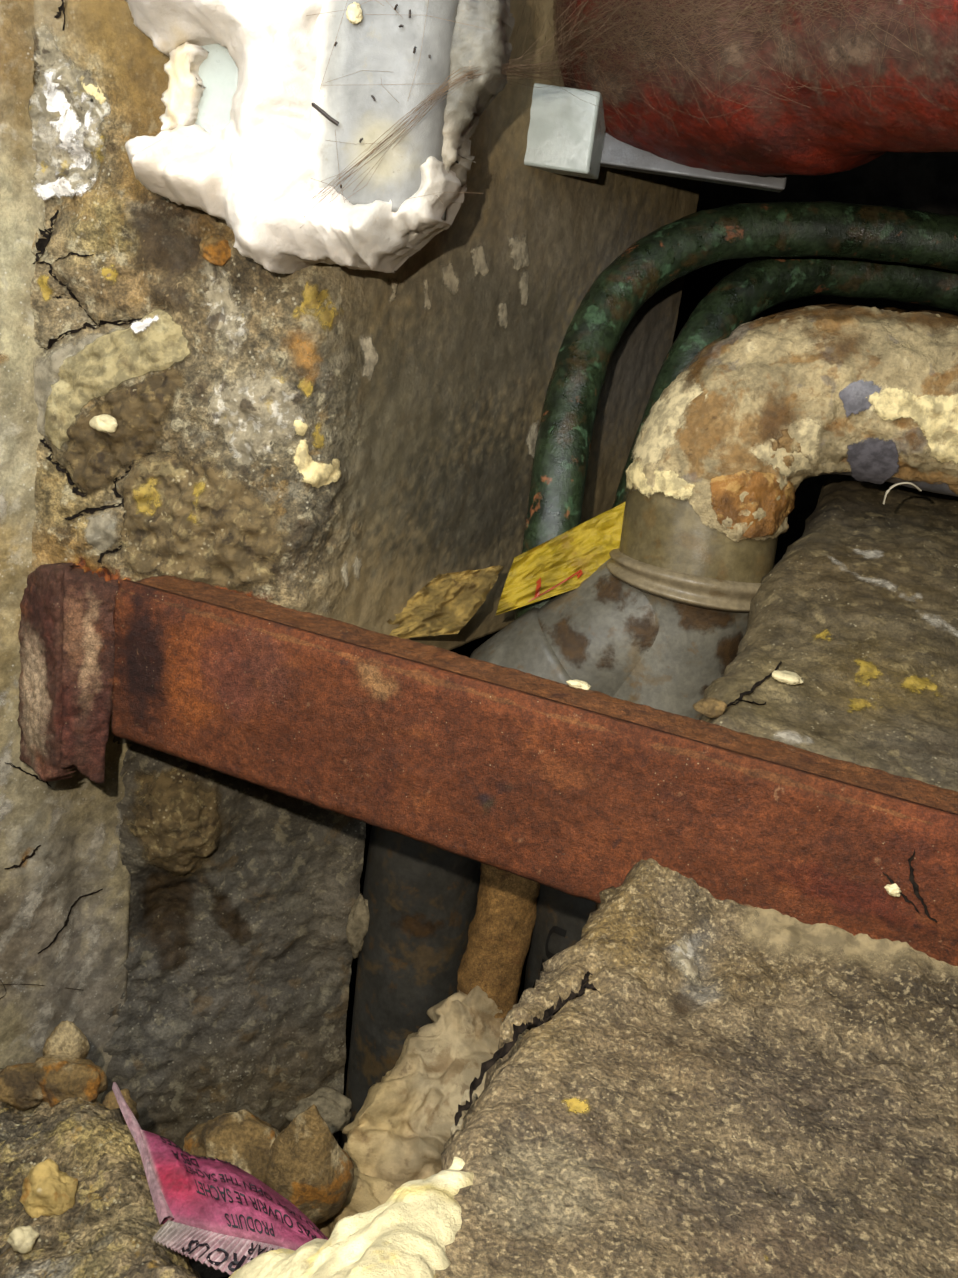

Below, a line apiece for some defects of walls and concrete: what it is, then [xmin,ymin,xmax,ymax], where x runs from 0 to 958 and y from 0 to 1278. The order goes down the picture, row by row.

crack [54,0,65,31]
crack [33,210,165,349]
spalling [201,261,248,357]
spalling [34,309,342,592]
rust [69,557,130,585]
crack [882,850,938,923]
crack [454,971,601,1126]